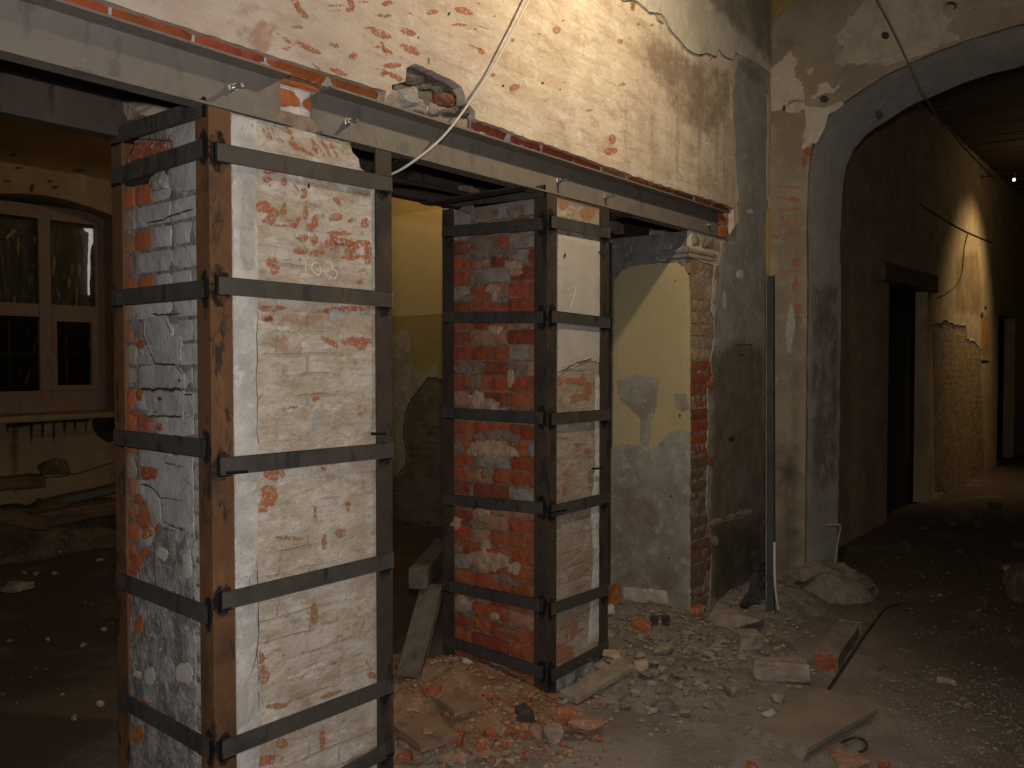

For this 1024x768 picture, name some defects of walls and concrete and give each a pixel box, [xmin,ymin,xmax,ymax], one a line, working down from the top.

spalling [64,0,729,237]
crack [622,0,736,61]
peeling [766,51,844,276]
peeling [392,329,438,477]
peeling [611,259,753,611]